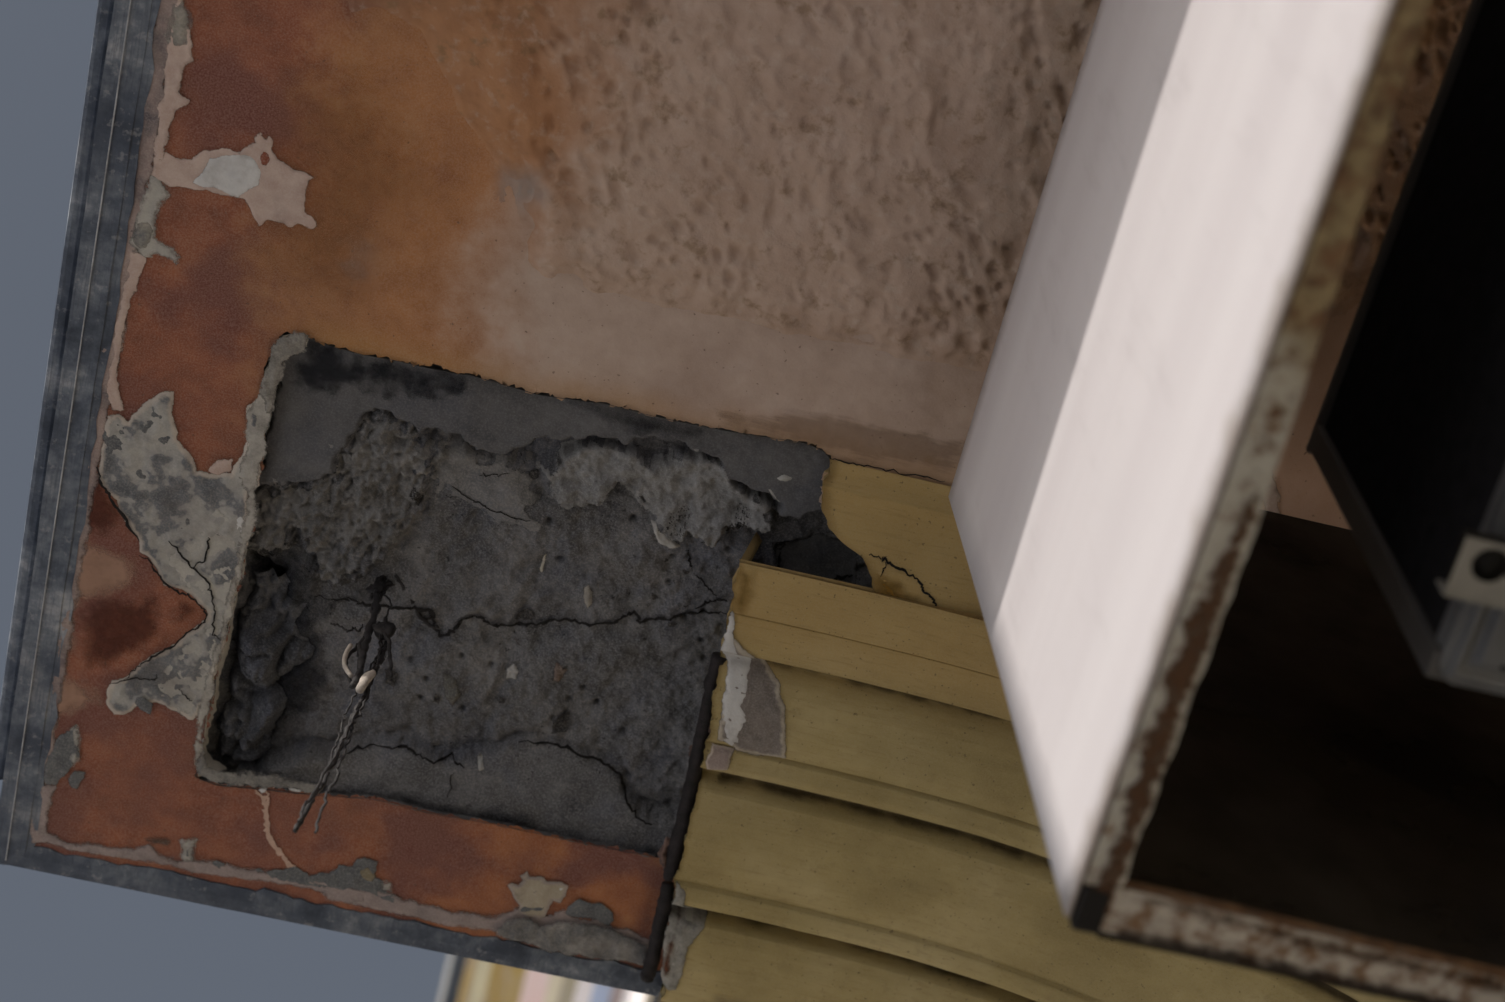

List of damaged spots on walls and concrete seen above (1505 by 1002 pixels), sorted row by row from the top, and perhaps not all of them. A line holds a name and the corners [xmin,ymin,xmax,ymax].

spalling [30,0,873,990]
crack [313,550,727,637]
rust [1095,492,1260,915]
crack [339,744,466,798]
crack [518,740,652,825]
rust [1119,931,1452,1002]
rust [1154,901,1420,972]
rust [1448,974,1505,991]